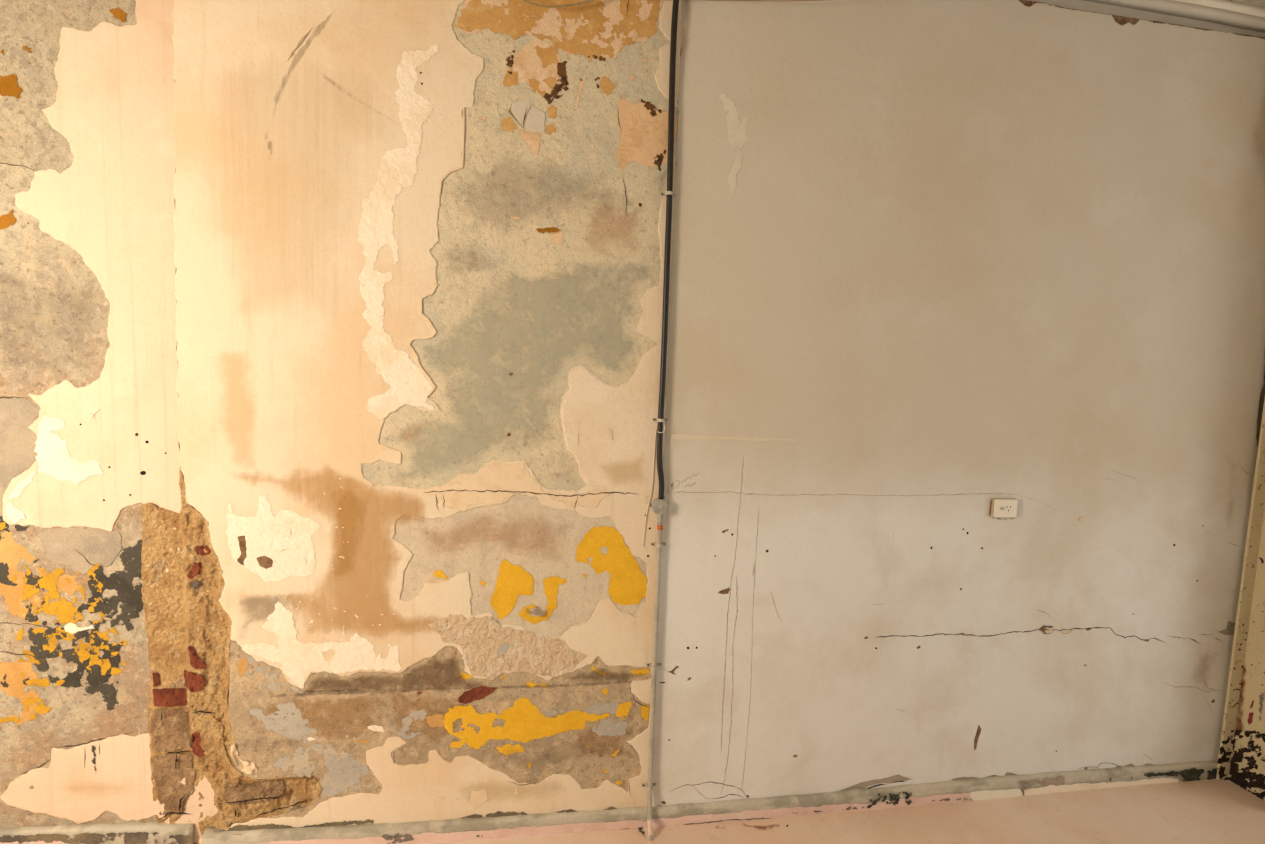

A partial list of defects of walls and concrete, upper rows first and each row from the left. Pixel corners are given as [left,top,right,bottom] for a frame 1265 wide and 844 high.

peeling [0,0,691,844]
crack [669,457,1056,825]
crack [874,610,1222,710]